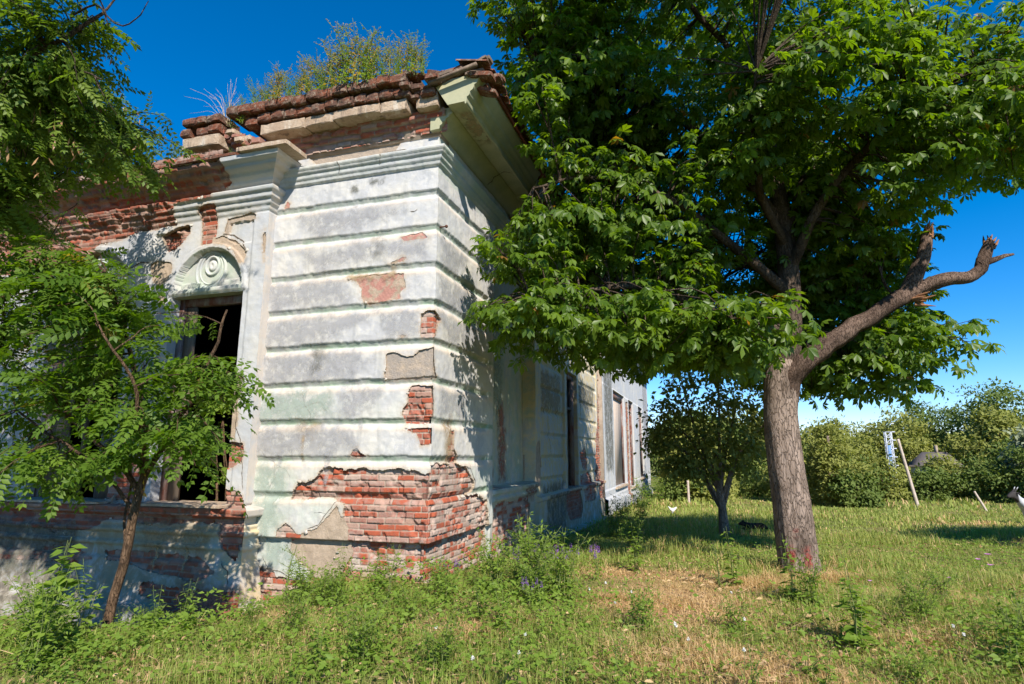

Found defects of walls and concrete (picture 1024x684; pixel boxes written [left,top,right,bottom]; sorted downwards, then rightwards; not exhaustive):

spalling [0,149,256,306]
peeling [347,257,407,305]
peeling [383,311,440,446]
spalling [0,463,246,564]
spalling [259,431,529,606]
spalling [105,550,239,629]